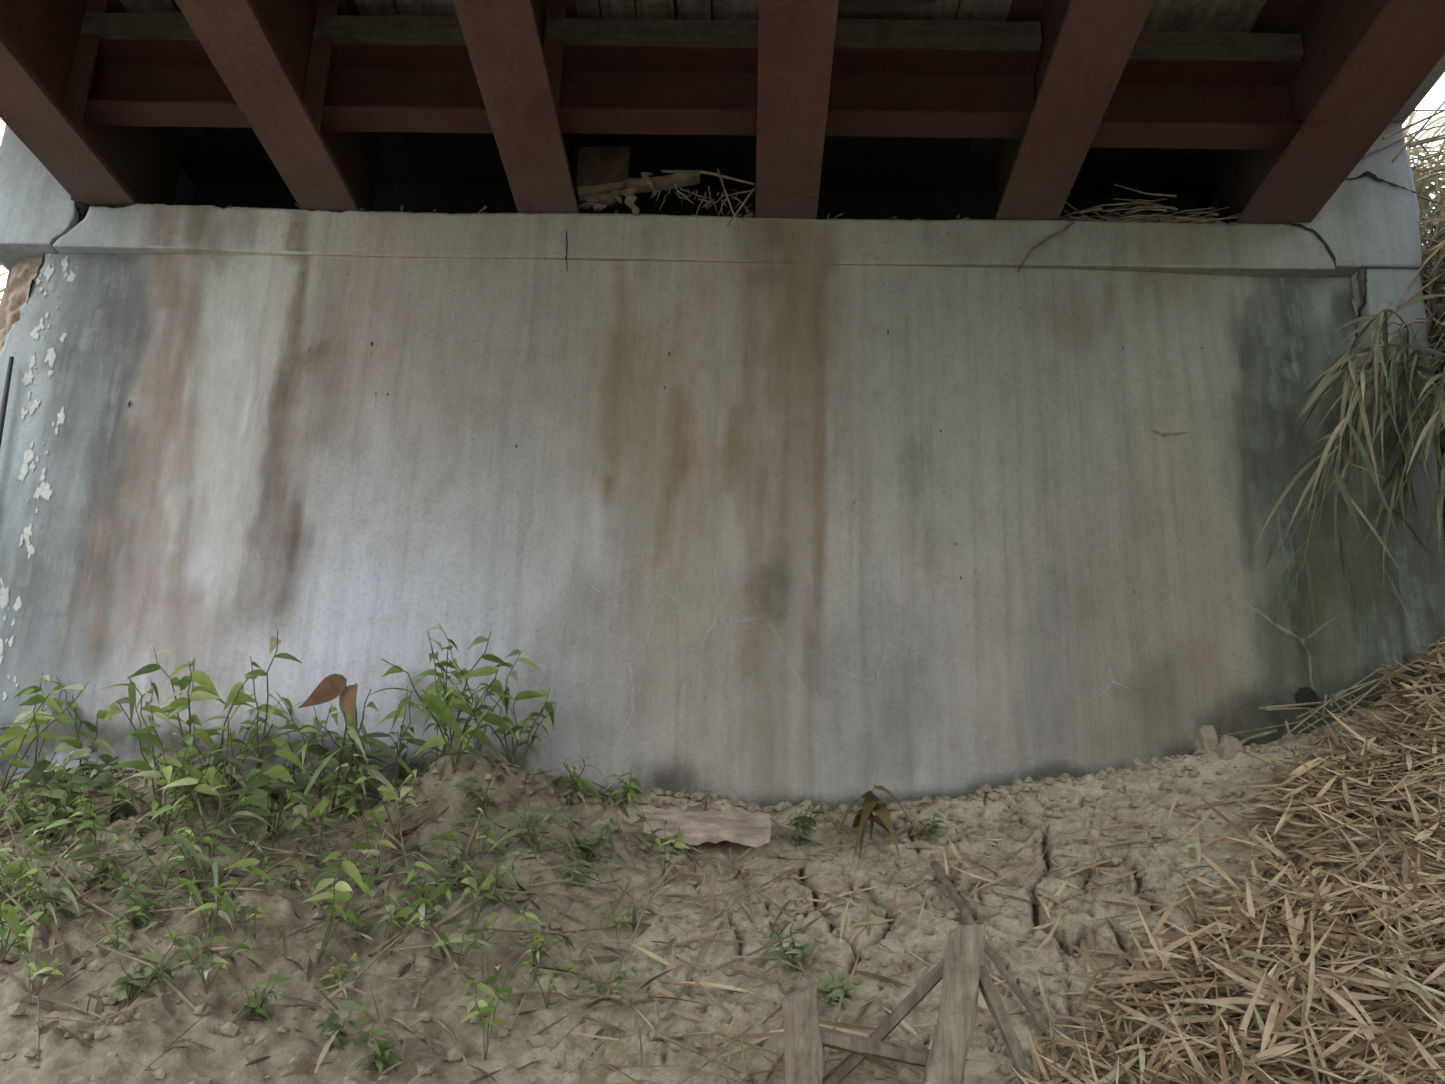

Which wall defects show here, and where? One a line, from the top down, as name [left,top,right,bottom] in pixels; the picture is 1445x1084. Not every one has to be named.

crack [1286,223,1336,262]
crack [1346,171,1417,193]
spalling [0,252,78,420]
peeling [18,406,65,559]
peeling [0,577,22,701]
leakage [1214,691,1313,746]